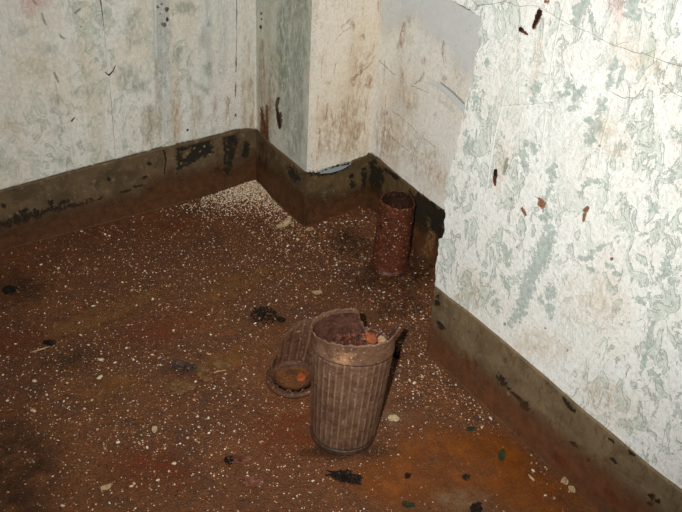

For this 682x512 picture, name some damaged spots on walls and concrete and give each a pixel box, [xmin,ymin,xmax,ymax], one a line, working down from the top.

rust [260,105,269,141]